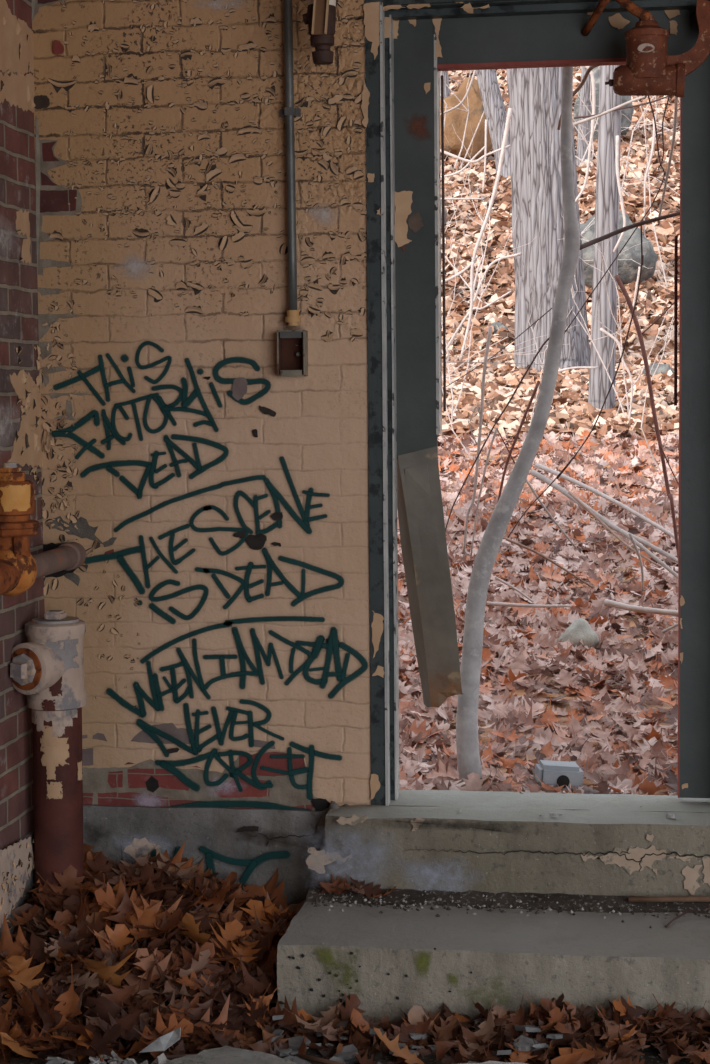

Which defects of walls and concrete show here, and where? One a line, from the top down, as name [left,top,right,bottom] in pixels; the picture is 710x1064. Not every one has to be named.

peeling [455,2,489,13]
peeling [609,13,630,29]
peeling [665,10,680,35]
peeling [0,0,443,642]
peeling [371,611,384,678]
peeling [131,723,195,754]
flaking render [82,733,326,811]
peeling [370,774,380,800]
peeling [306,846,352,874]
crack [406,849,710,871]
peeling [581,834,710,895]
peeling [0,837,35,930]